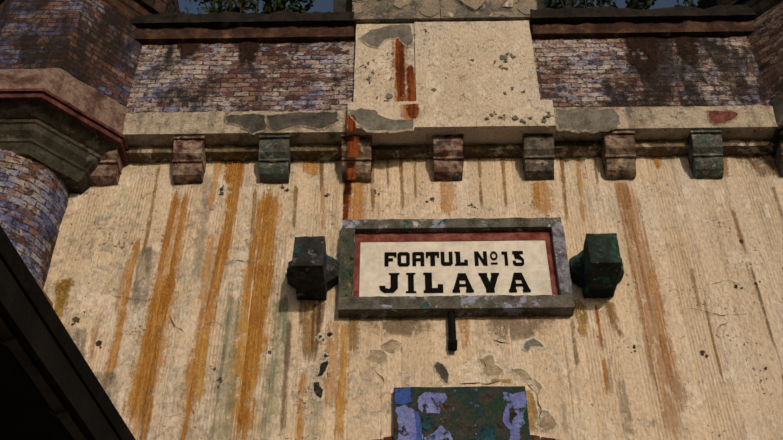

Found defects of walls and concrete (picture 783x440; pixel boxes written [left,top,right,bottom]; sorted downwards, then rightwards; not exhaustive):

spalling [224,107,415,135]
corrosion [342,115,364,220]
corrosion [392,38,420,120]
spalling [542,107,621,134]
leakage [103,168,160,387]
leakage [122,190,190,440]
leakage [178,161,243,440]
leakage [224,189,279,440]
spalling [310,331,335,402]
peeling [394,361,453,440]
peeling [477,353,545,440]
leakage [614,182,675,391]